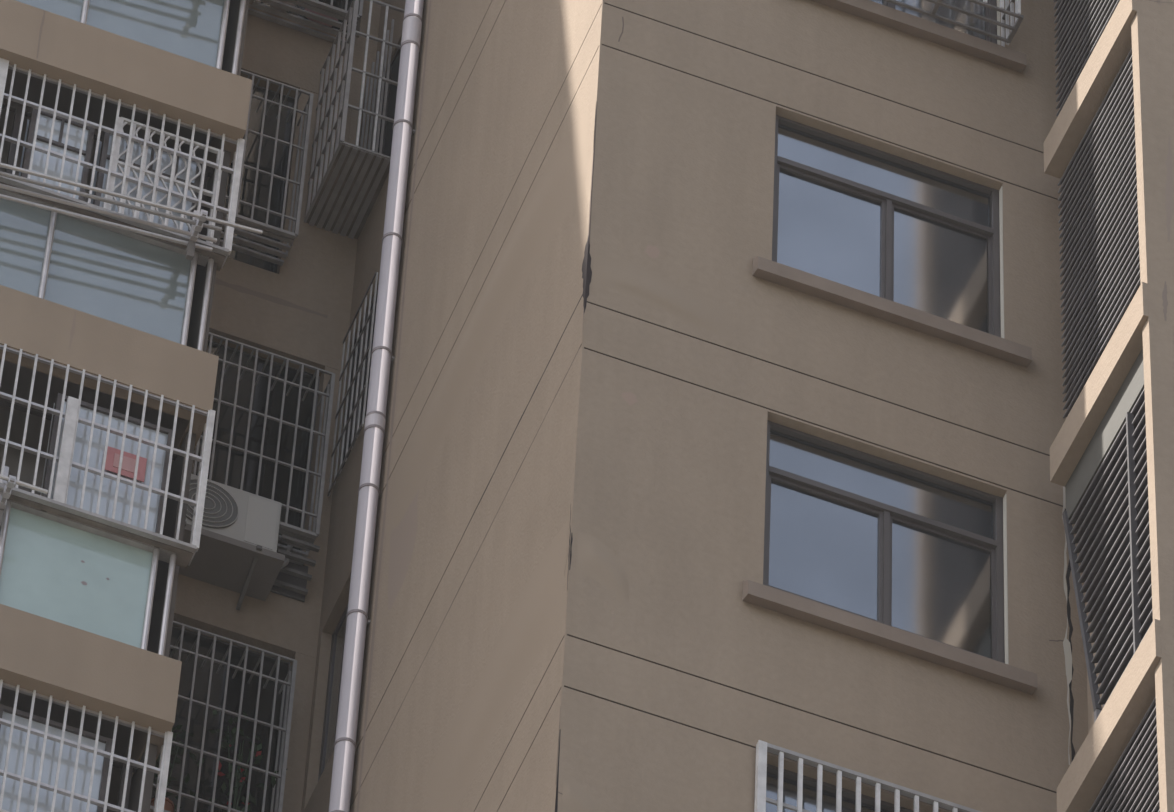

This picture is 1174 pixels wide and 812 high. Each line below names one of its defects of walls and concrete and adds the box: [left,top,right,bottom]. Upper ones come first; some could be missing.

crack [587,109,597,243]
crack [1049,559,1075,761]